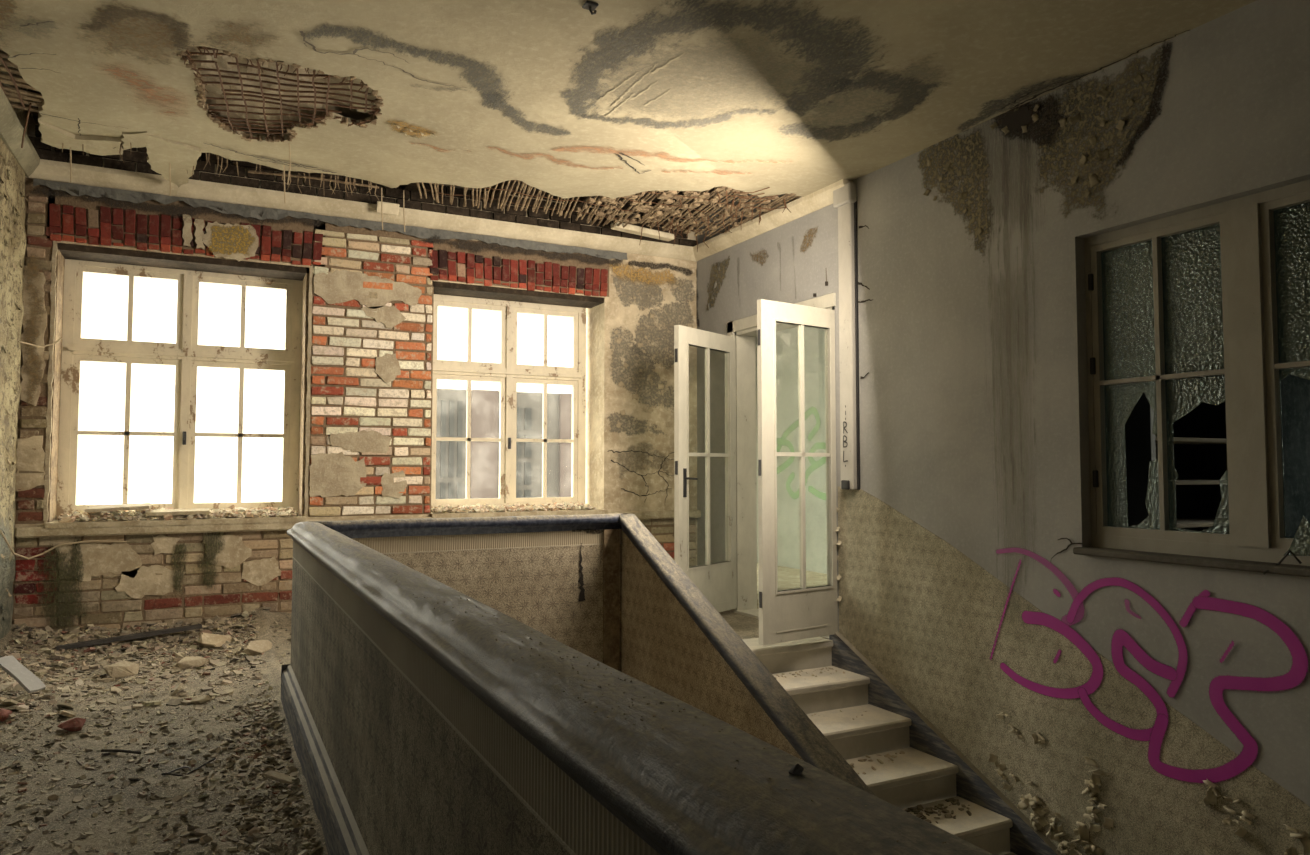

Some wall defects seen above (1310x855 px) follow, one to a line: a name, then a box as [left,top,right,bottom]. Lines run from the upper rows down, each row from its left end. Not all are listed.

spalling [176,46,384,185]
damp [304,25,571,136]
damp [561,0,938,142]
flaking render [918,43,1170,253]
flaking render [0,153,293,631]
flaking render [308,215,433,517]
peeling [607,259,730,437]
flaking render [640,518,696,567]
peeling [1202,778,1255,827]